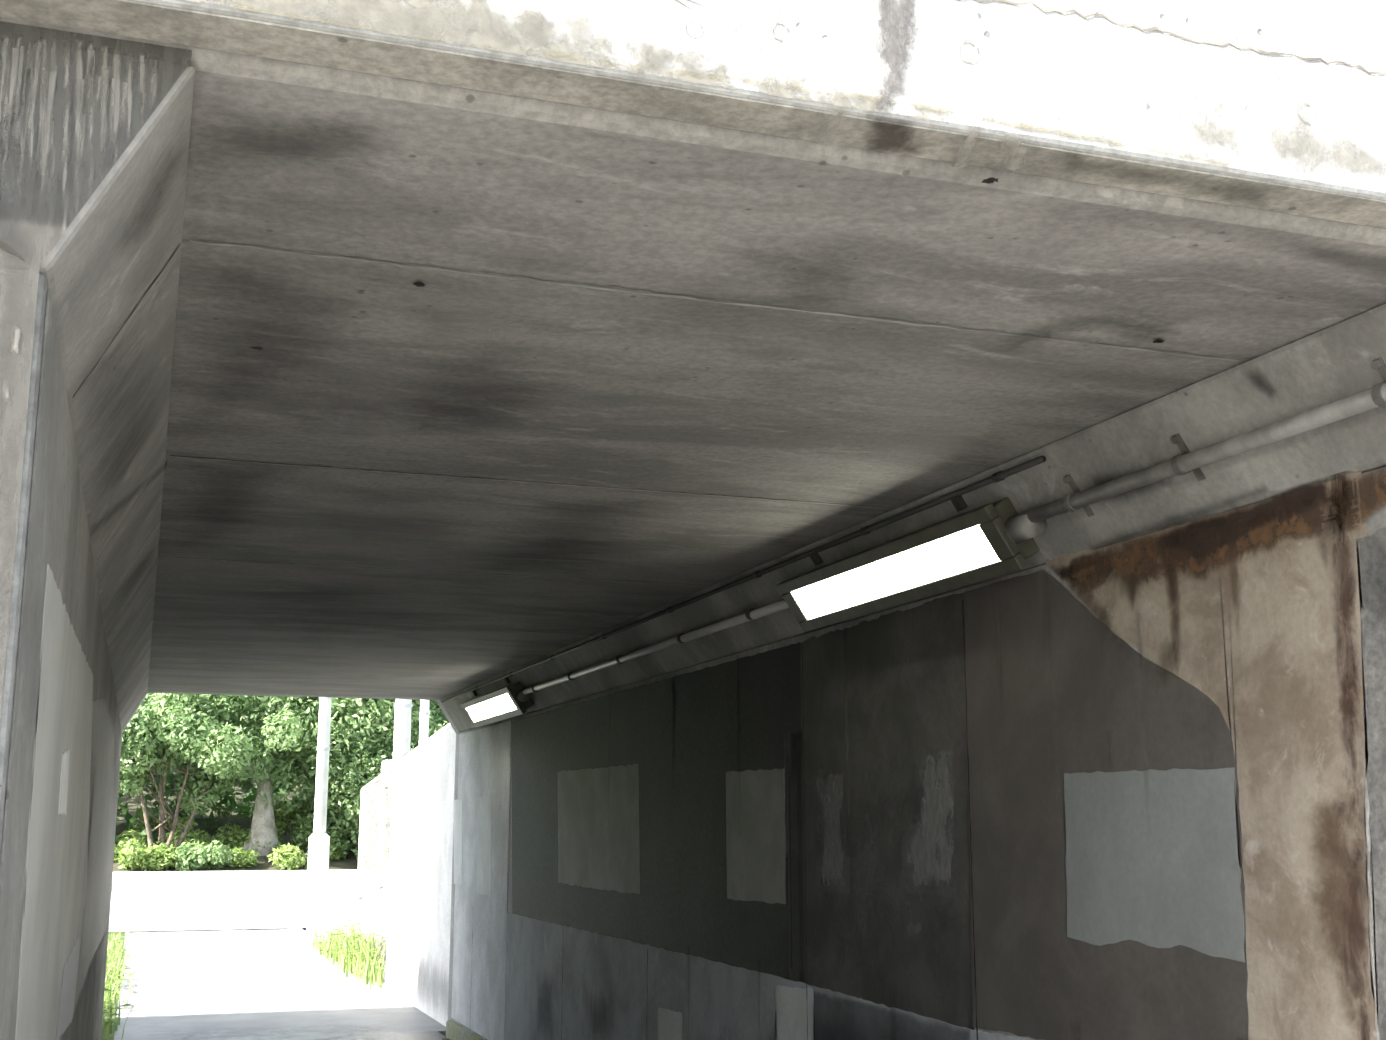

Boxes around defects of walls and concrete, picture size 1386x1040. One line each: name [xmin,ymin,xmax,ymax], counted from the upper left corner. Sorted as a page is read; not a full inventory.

damp [0,37,156,225]
damp [872,0,914,150]
crack [976,0,1386,75]
rust [1056,468,1386,766]
rust [1317,799,1369,1040]